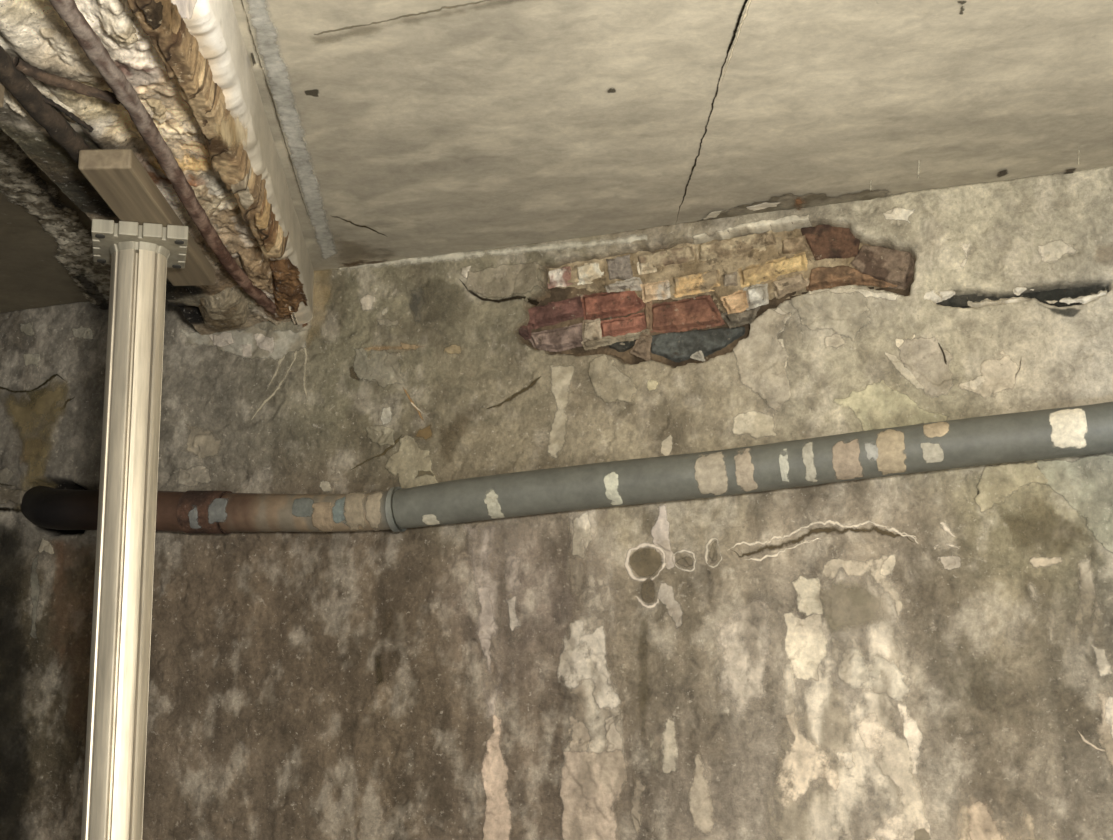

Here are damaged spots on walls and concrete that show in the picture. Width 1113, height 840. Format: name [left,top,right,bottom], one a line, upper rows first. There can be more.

spalling [0,0,308,336]
rust [127,0,289,259]
crack [314,0,488,35]
flaking render [461,224,915,411]
crack [677,0,751,219]
peeling [834,334,1018,431]
flaking render [924,286,1109,317]
peeling [1038,240,1076,262]
crack [730,520,959,561]
leakage [0,528,33,840]